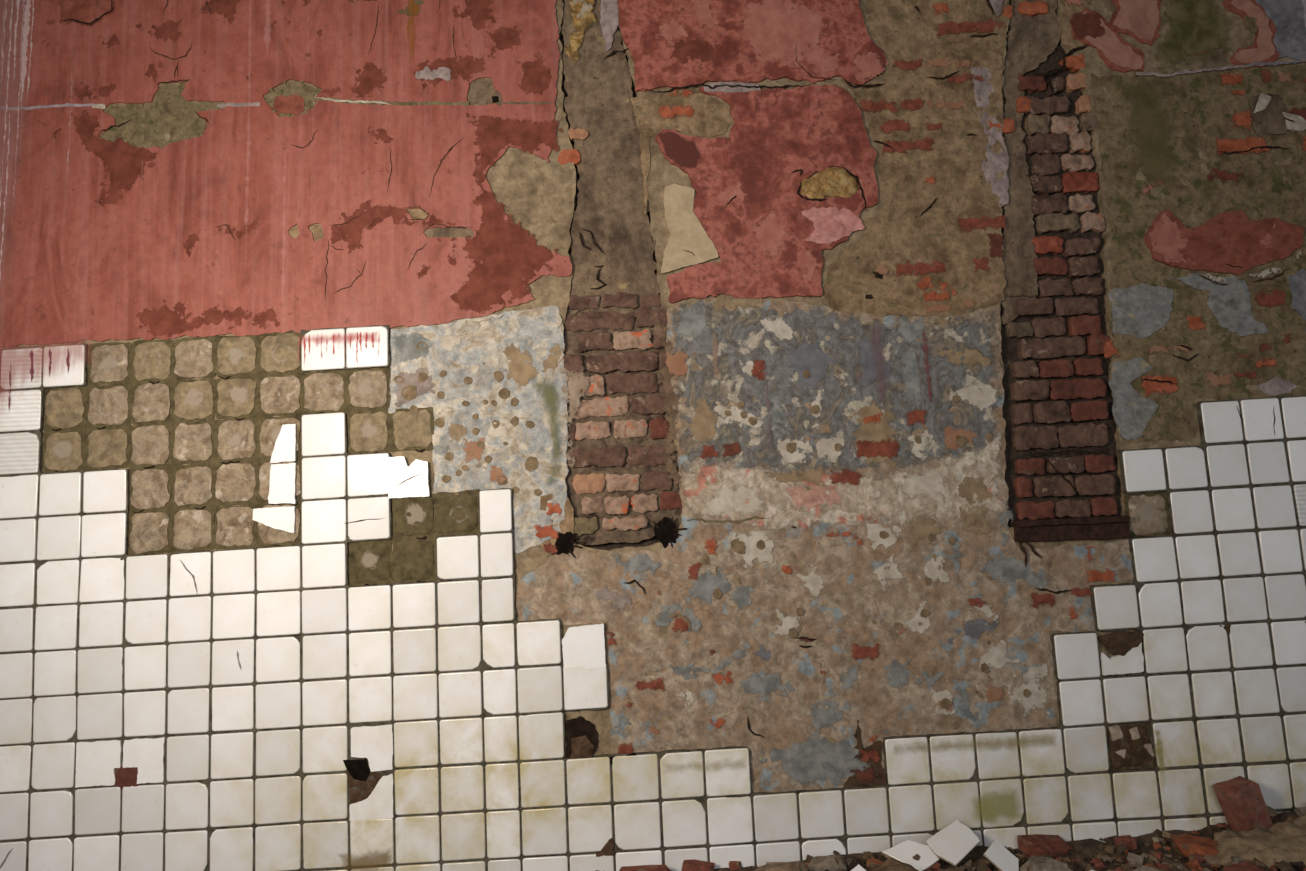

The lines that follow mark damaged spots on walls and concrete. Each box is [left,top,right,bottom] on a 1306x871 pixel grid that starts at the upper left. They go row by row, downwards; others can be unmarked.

crack [637,45,882,93]
damp [0,0,34,275]
flaking render [37,60,223,208]
flaking render [288,0,1306,634]
peeling [42,300,510,587]
spalling [562,623,616,669]
spalling [1098,630,1144,675]
spalling [75,737,165,791]
spalling [343,724,394,821]
spalling [565,716,637,765]
peeling [747,643,979,788]
peeling [1107,722,1154,771]